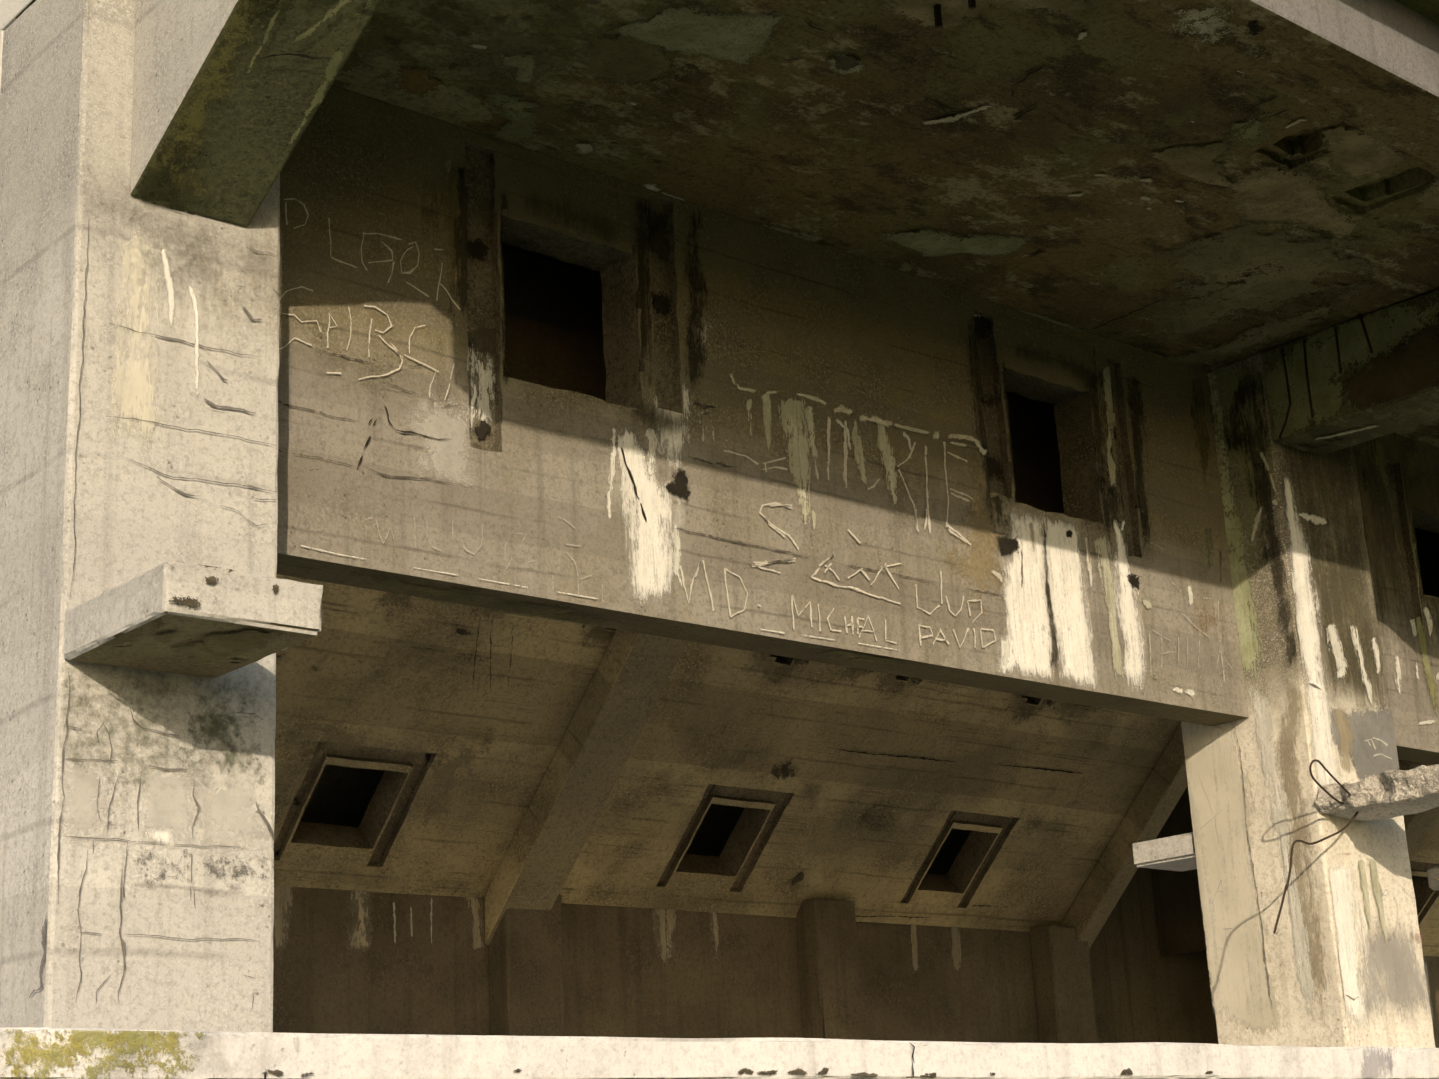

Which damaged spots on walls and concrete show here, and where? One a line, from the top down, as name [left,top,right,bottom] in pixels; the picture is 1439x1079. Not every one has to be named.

damp [294,0,373,42]
damp [284,49,343,152]
damp [454,167,470,311]
spalling [1140,96,1412,239]
damp [1190,373,1439,1023]
crack [29,671,260,1002]
damp [1,1029,203,1079]
damp [1363,1049,1393,1077]